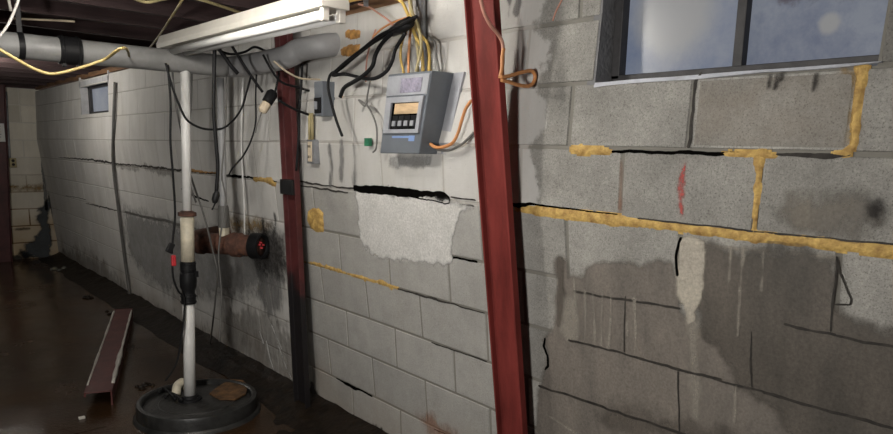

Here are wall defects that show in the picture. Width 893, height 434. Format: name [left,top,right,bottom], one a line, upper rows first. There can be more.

crack [58,157,277,187]
crack [300,180,476,207]
crack [513,64,893,336]
damp [533,242,893,434]
crack [703,332,787,399]